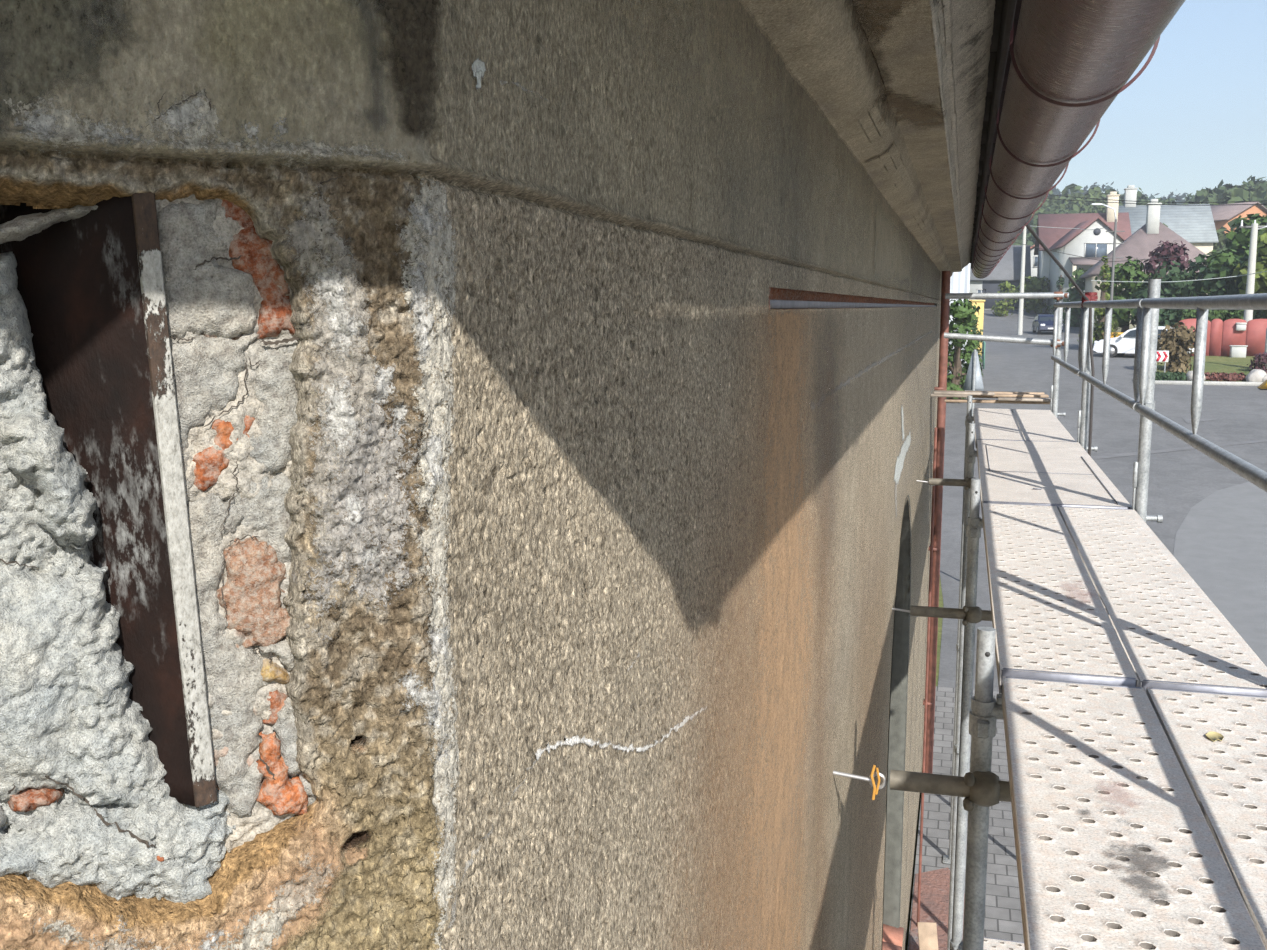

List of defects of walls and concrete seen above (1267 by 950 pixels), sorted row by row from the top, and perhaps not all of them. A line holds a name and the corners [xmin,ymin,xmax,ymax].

water stain [0,0,441,170]
water stain [845,0,890,105]
spalling [0,205,98,244]
spalling [156,194,317,852]
spalling [7,787,64,812]